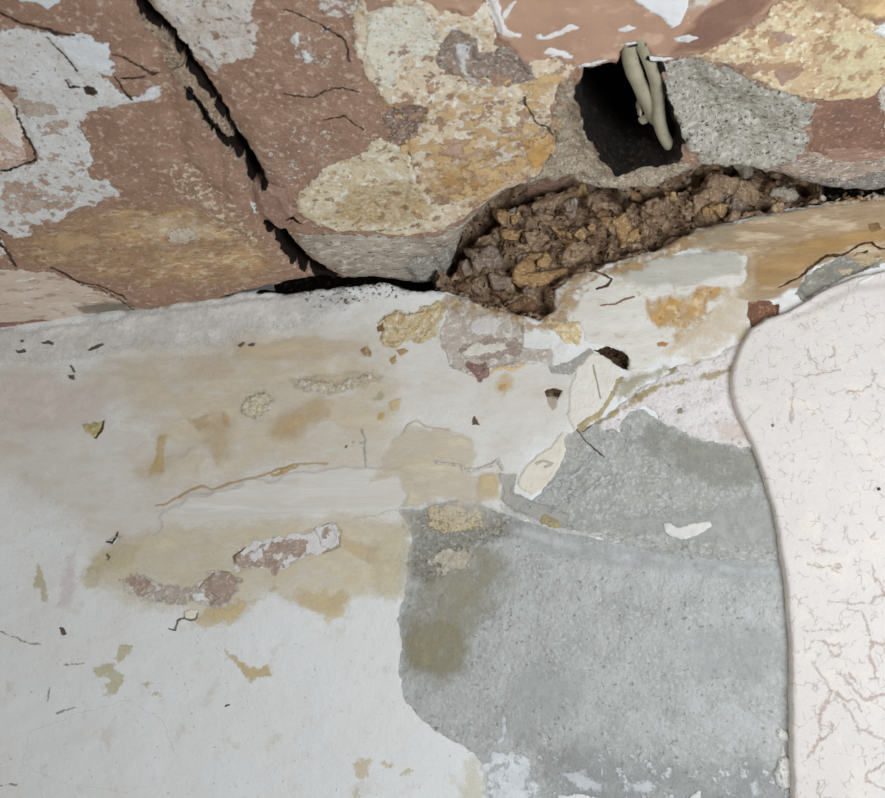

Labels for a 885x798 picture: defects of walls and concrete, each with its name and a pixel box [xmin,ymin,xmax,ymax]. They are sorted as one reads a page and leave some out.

peeling [55,36,115,72]
crack [284,9,351,62]
peeling [673,35,698,43]
peeling [115,85,163,106]
crack [256,217,463,294]
spalling [377,56,885,382]
crack [779,242,885,288]
crack [156,462,328,506]
water stain [0,330,564,624]
peeling [119,522,340,631]
spalling [397,409,791,798]
crack [808,577,885,757]